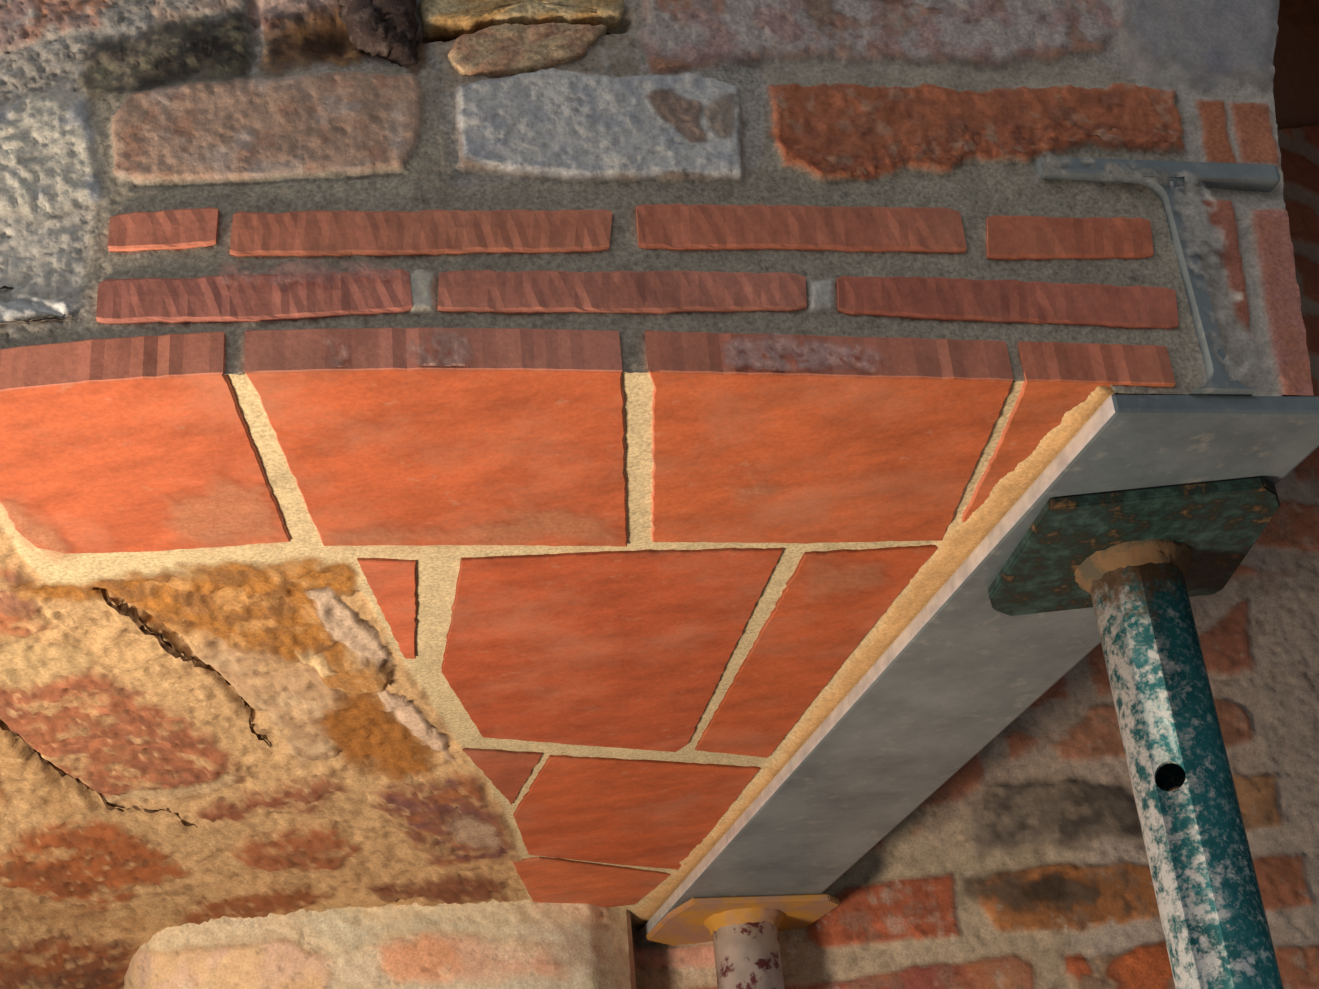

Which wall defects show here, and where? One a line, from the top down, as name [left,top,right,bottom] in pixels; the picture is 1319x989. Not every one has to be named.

crack [0,285,73,325]
peeling [0,296,73,323]
crack [92,587,271,748]
crack [0,719,198,828]